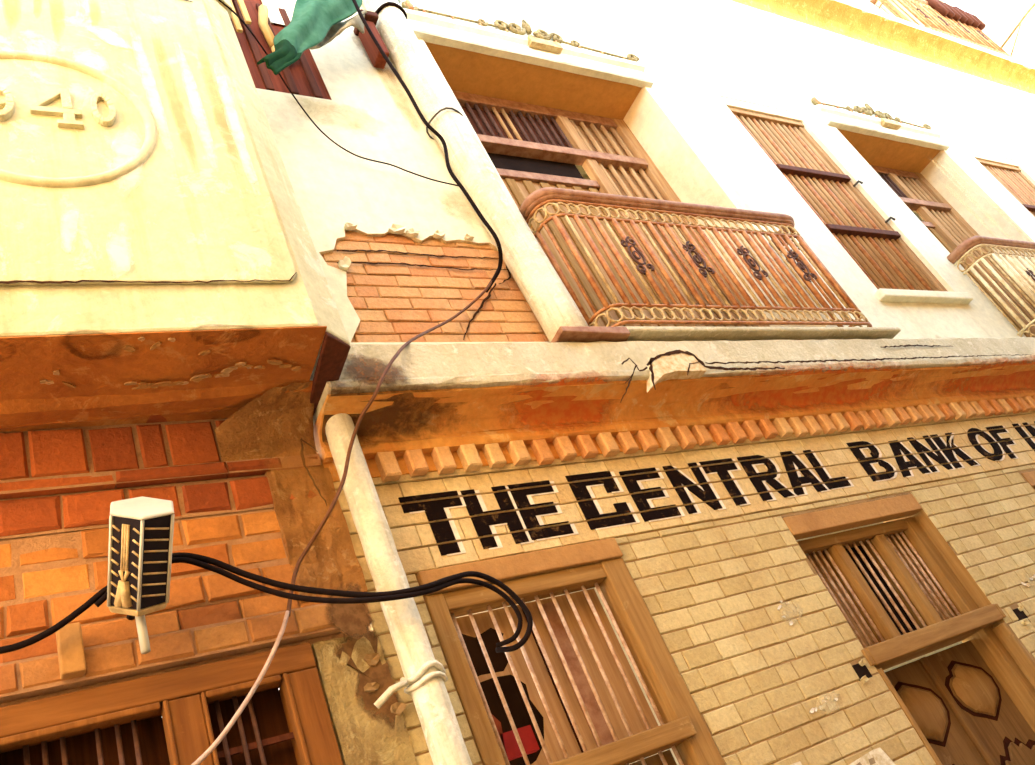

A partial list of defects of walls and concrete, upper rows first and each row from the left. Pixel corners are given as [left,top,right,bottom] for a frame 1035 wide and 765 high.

spalling [321,222,550,342]
water stain [331,355,450,443]
crack [620,344,1029,403]
water stain [322,415,334,443]
peeling [364,682,379,693]